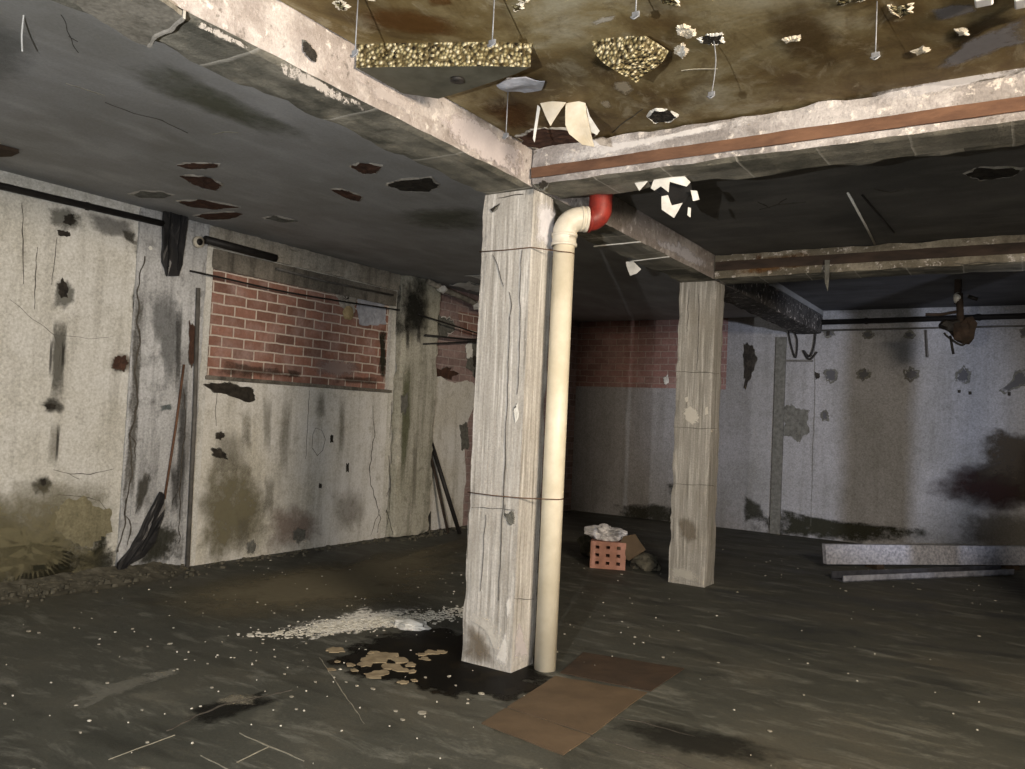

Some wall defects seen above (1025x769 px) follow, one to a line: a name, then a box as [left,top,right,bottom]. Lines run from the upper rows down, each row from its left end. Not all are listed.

spalling [127,162,242,221]
spalling [963,166,1025,181]
water stain [49,327,66,394]
crack [53,256,146,552]
flaking render [203,381,255,402]
spalling [436,366,459,380]
water stain [942,430,1025,546]
water stain [0,491,113,582]
water stain [745,498,924,542]